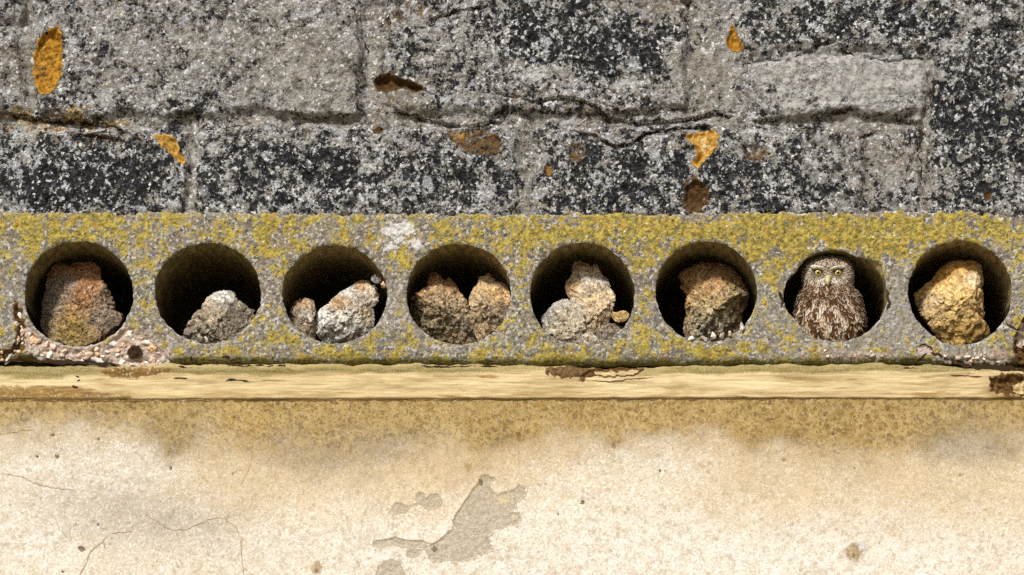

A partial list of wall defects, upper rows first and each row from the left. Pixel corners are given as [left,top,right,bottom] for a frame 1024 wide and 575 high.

crack [398,111,448,124]
crack [571,103,733,147]
spalling [0,300,170,367]
damp [0,385,1024,453]
peeling [372,464,528,575]